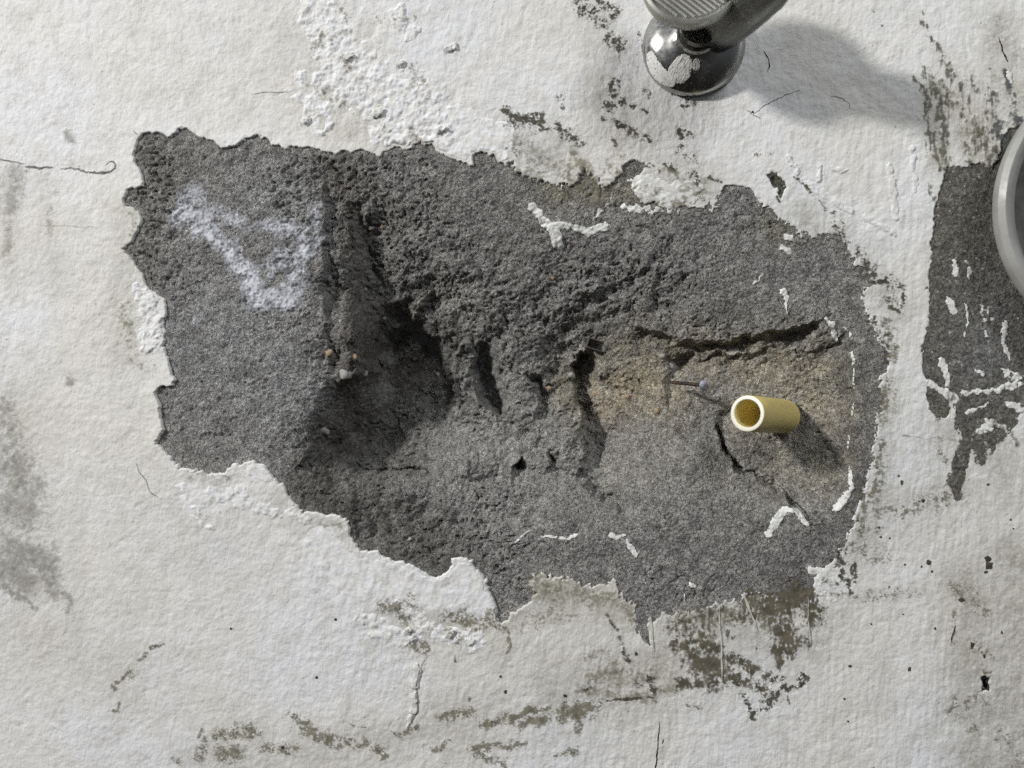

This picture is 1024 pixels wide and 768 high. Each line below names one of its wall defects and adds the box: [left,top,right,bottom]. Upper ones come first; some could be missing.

leakage [912,11,999,172]
leakage [377,593,430,655]
spalling [123,101,890,654]
leakage [436,439,965,768]
crack [719,429,819,537]
peeling [921,126,1024,501]